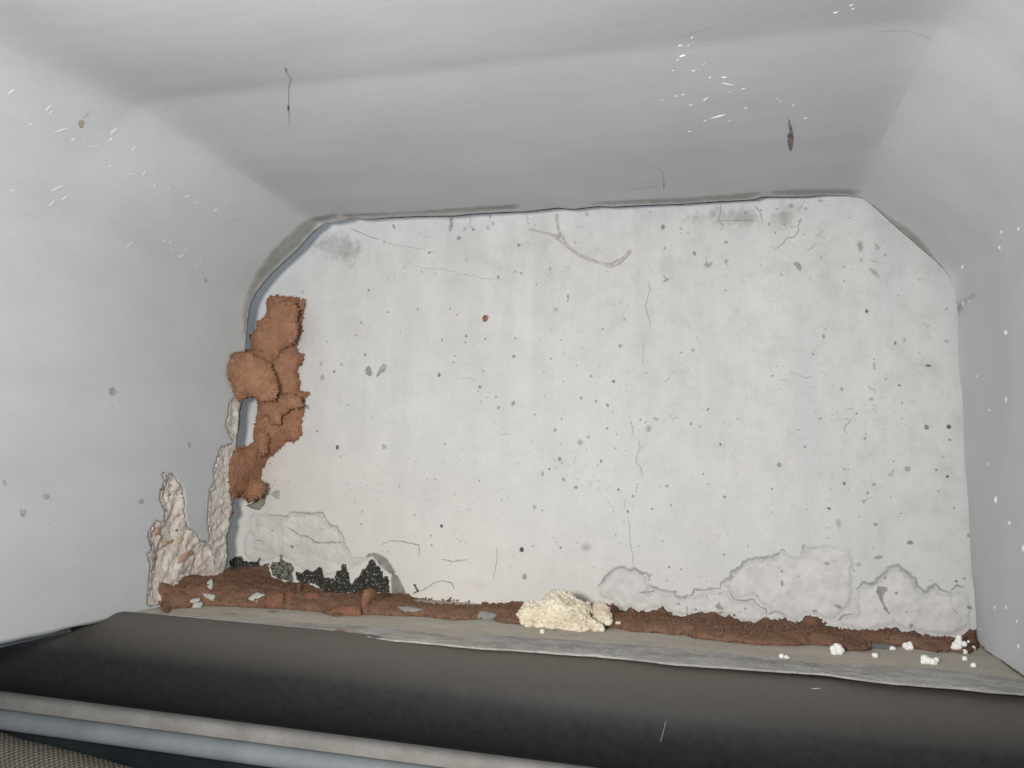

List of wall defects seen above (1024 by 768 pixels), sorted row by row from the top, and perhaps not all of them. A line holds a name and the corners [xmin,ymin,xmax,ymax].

crack [246,195,949,339]
peeling [245,511,362,575]
damp [229,546,419,594]
peeling [598,545,969,633]